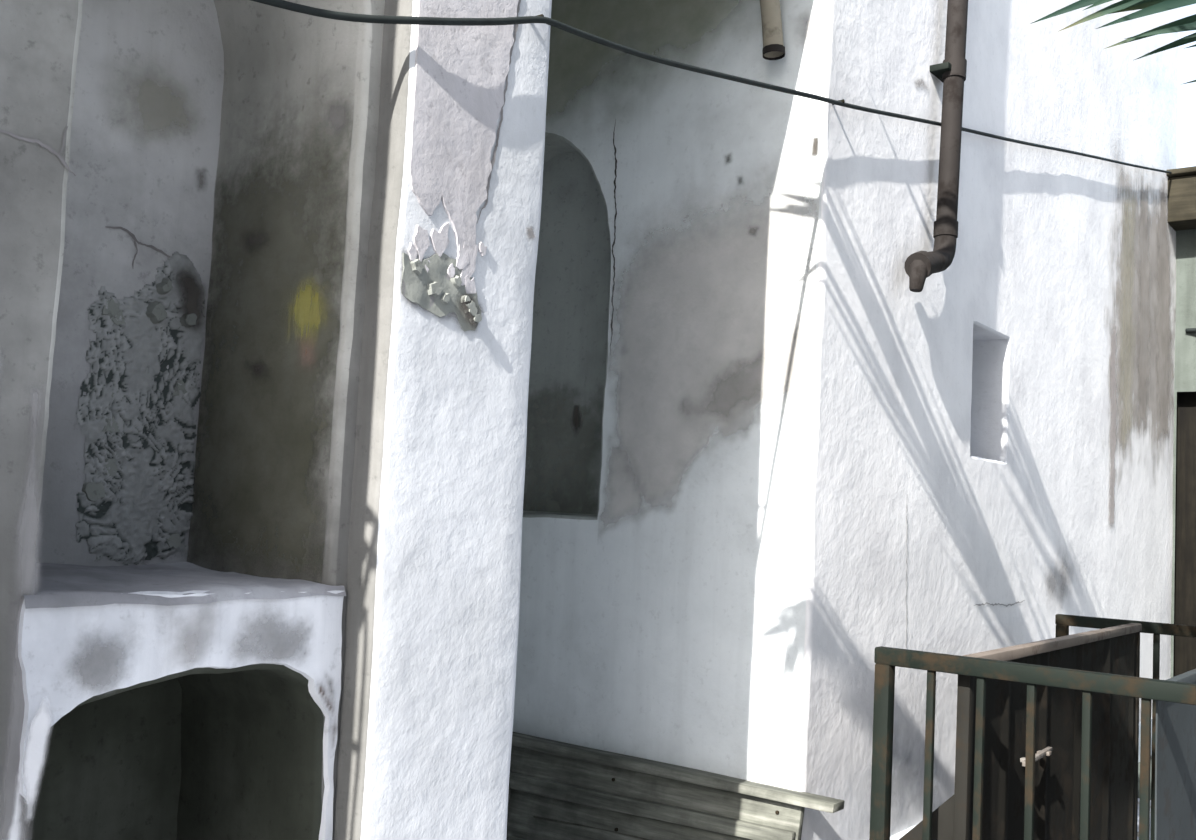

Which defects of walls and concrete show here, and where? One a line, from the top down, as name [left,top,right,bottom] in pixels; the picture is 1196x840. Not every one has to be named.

crack [105,226,171,267]
spalling [76,251,206,566]
water stain [192,105,348,578]
peeling [401,0,519,332]
crack [609,119,617,354]
water stain [523,181,811,524]